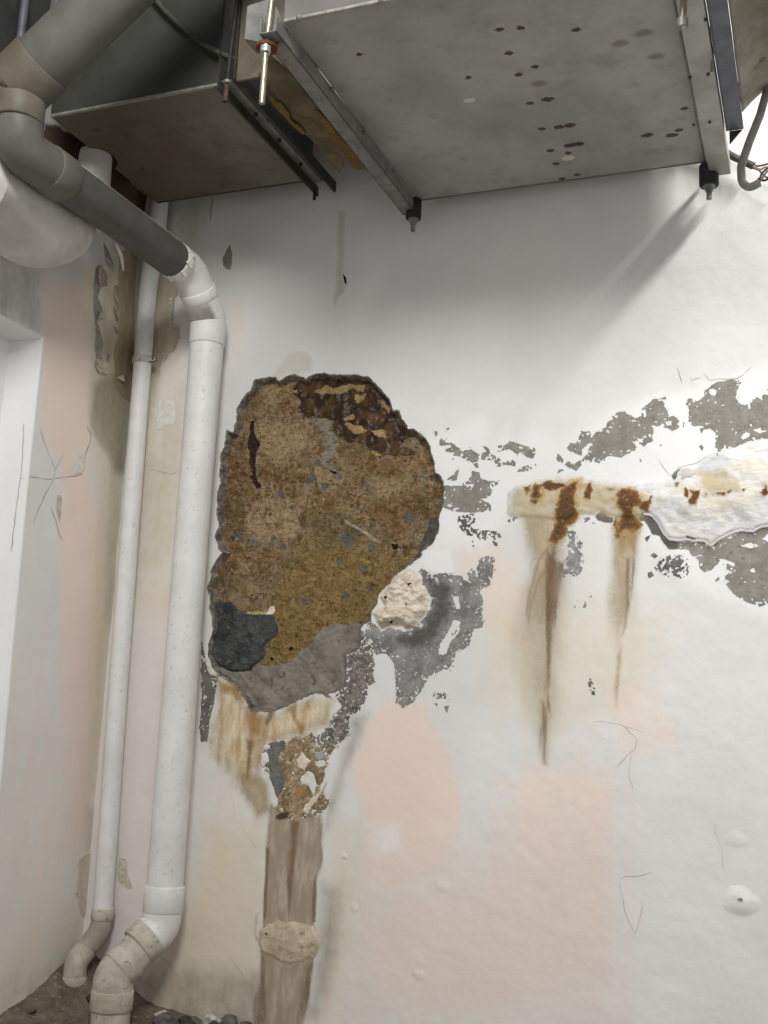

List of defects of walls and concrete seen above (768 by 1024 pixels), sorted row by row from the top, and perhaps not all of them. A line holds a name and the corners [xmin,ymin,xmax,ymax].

peeling [93,242,137,403]
peeling [556,379,768,474]
crack [11,425,81,550]
spalling [199,373,536,743]
rust [524,478,593,545]
peeling [560,530,584,578]
water stain [514,483,644,682]
rust [608,487,652,538]
peeling [637,512,768,607]
water stain [210,677,333,928]
peeling [261,732,338,820]
water stain [254,952,313,1024]